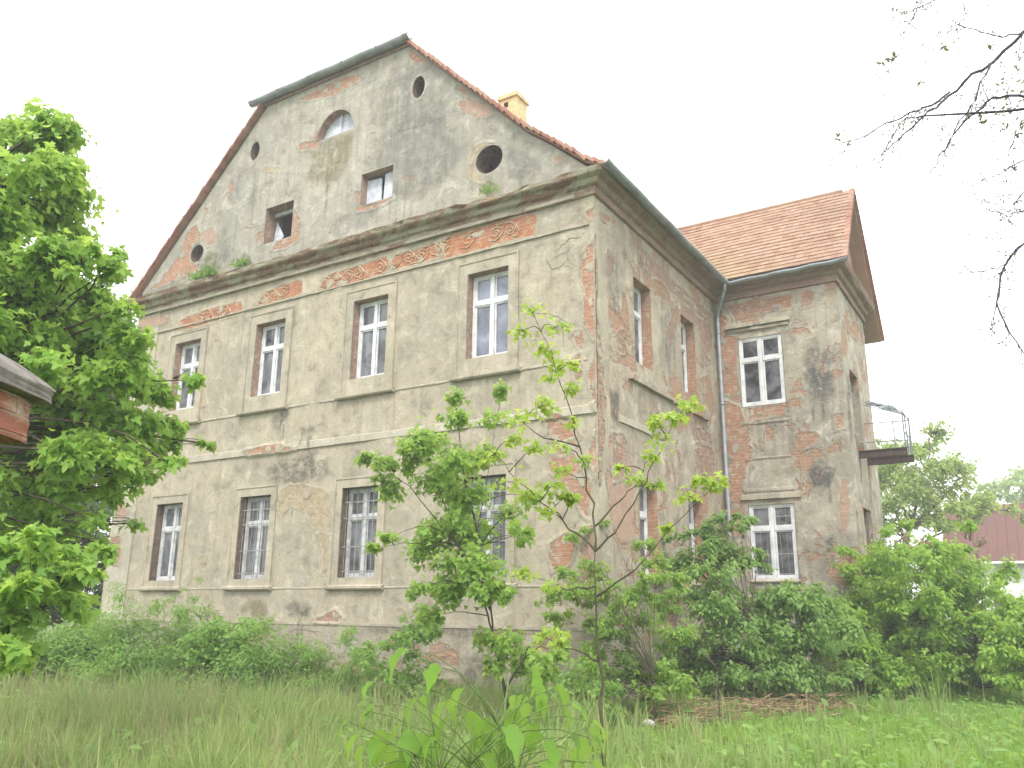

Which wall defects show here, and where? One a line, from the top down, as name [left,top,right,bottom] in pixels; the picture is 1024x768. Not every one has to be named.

spalling [145,220,218,295]
spalling [242,440,299,459]
spalling [541,237,636,618]
spalling [636,243,818,539]
spalling [311,605,347,627]